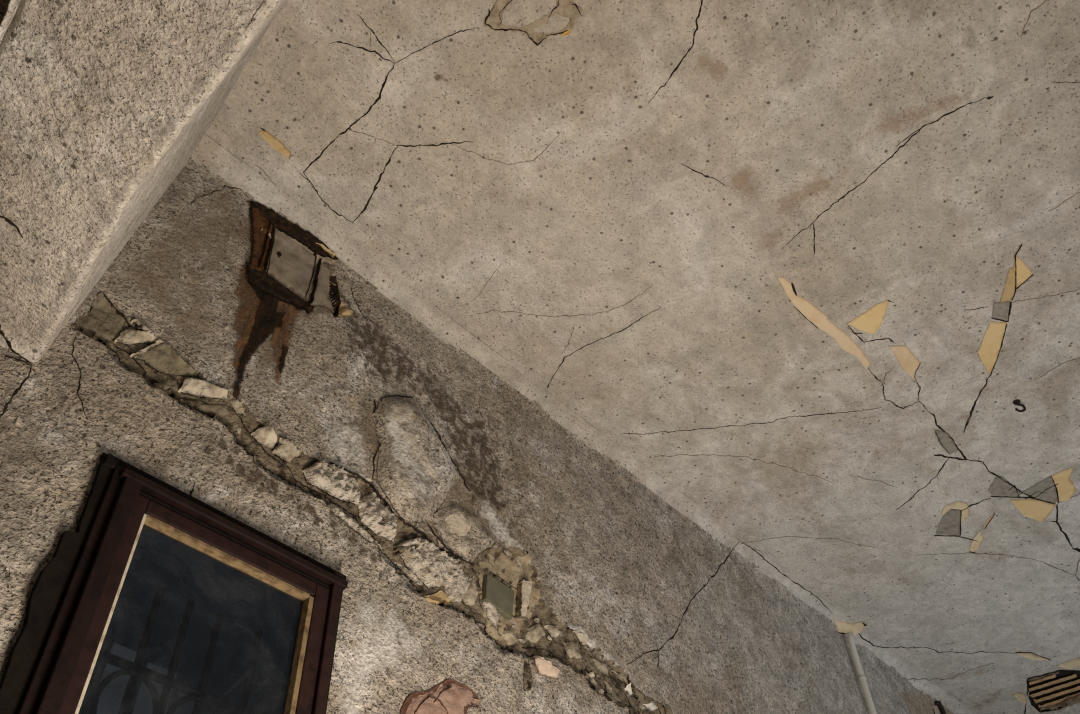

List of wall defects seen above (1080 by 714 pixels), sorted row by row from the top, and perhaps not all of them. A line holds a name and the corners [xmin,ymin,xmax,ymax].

flaking render [484,0,583,46]
crack [649,0,703,102]
crack [254,14,561,222]
crack [786,96,994,254]
crack [0,325,32,419]
corrosion [233,201,314,397]
peeling [777,276,891,369]
peeling [978,244,1033,376]
peeling [935,501,996,553]
crack [925,493,1080,581]
peeling [988,467,1076,522]
crack [626,536,875,666]